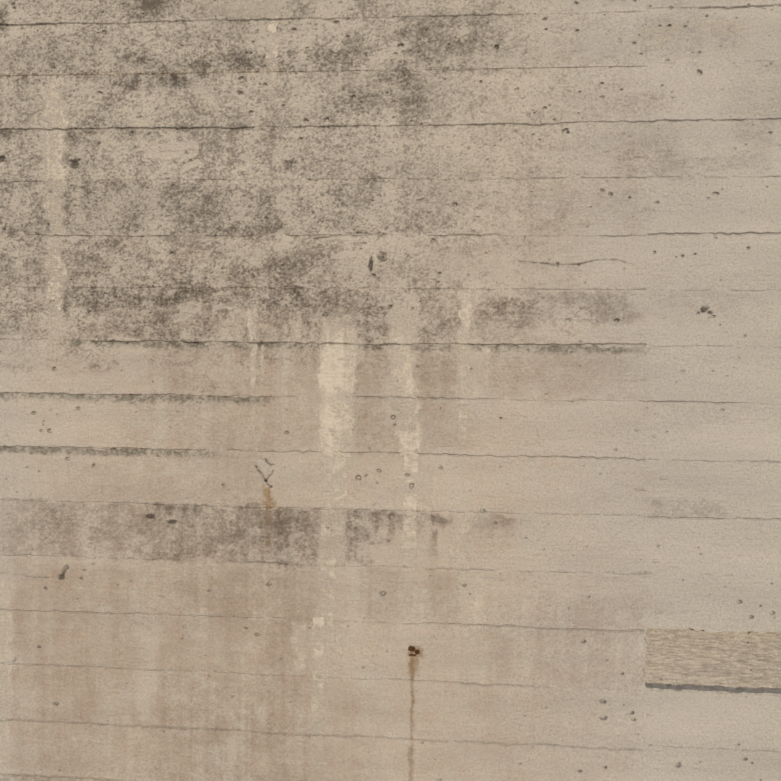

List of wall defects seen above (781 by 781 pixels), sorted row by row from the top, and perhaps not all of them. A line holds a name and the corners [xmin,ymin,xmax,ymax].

water stain [236,311,267,402]
rust [408,646,421,671]